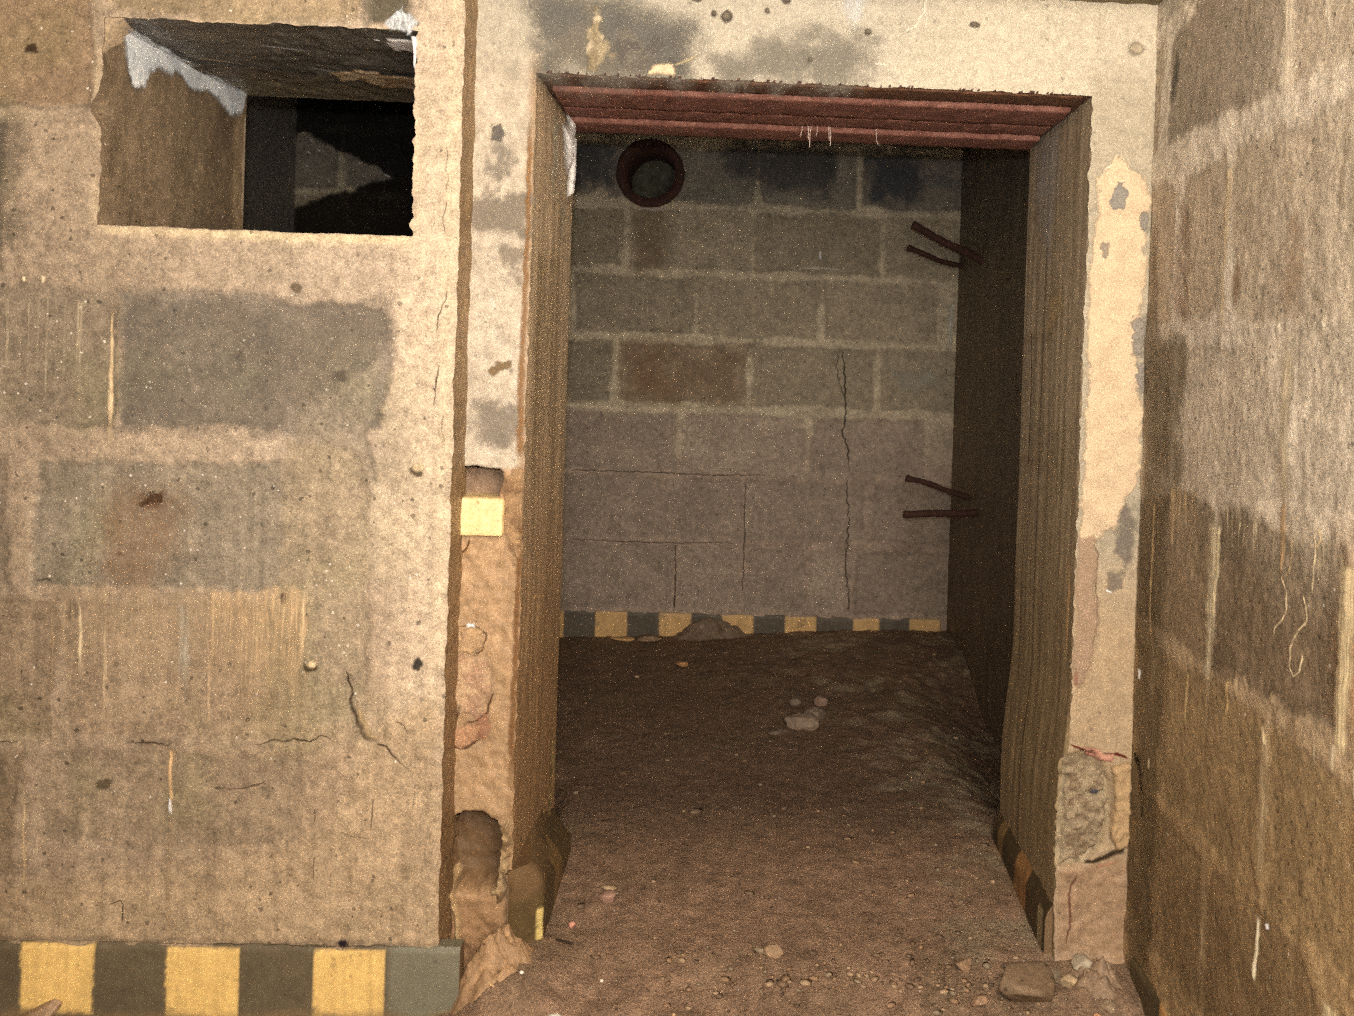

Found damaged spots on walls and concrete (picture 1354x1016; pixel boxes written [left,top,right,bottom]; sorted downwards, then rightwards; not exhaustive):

crack [836,354,849,462]
peeling [1072,155,1152,687]
crack [256,673,409,769]
peeling [449,863,462,939]
spalling [490,820,512,903]
spalling [1059,755,1107,864]